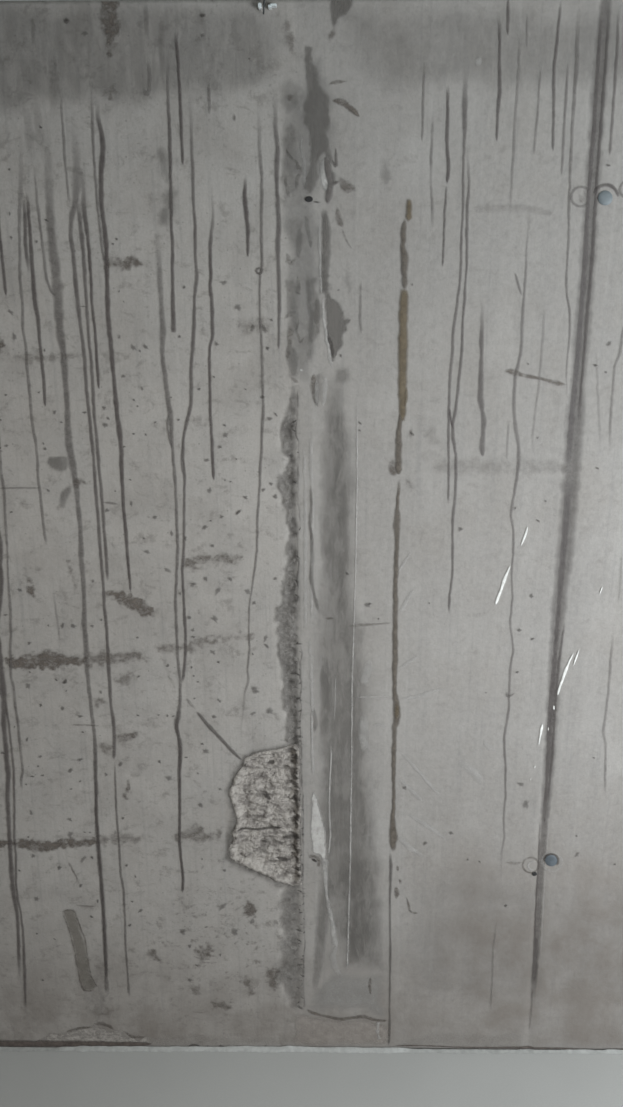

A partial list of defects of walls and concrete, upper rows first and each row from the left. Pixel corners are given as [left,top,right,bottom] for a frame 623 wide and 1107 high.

leakage [0,460,26,1002]
leakage [19,207,107,980]
leakage [70,121,131,757]
leakage [161,42,215,889]
leakage [243,140,281,668]
spalling [224,744,302,886]
leakage [311,752,350,946]
leakage [326,290,350,359]
corrosion [390,488,400,849]
corrosion [396,200,412,474]
crack [507,370,563,385]
leakage [528,1,617,978]